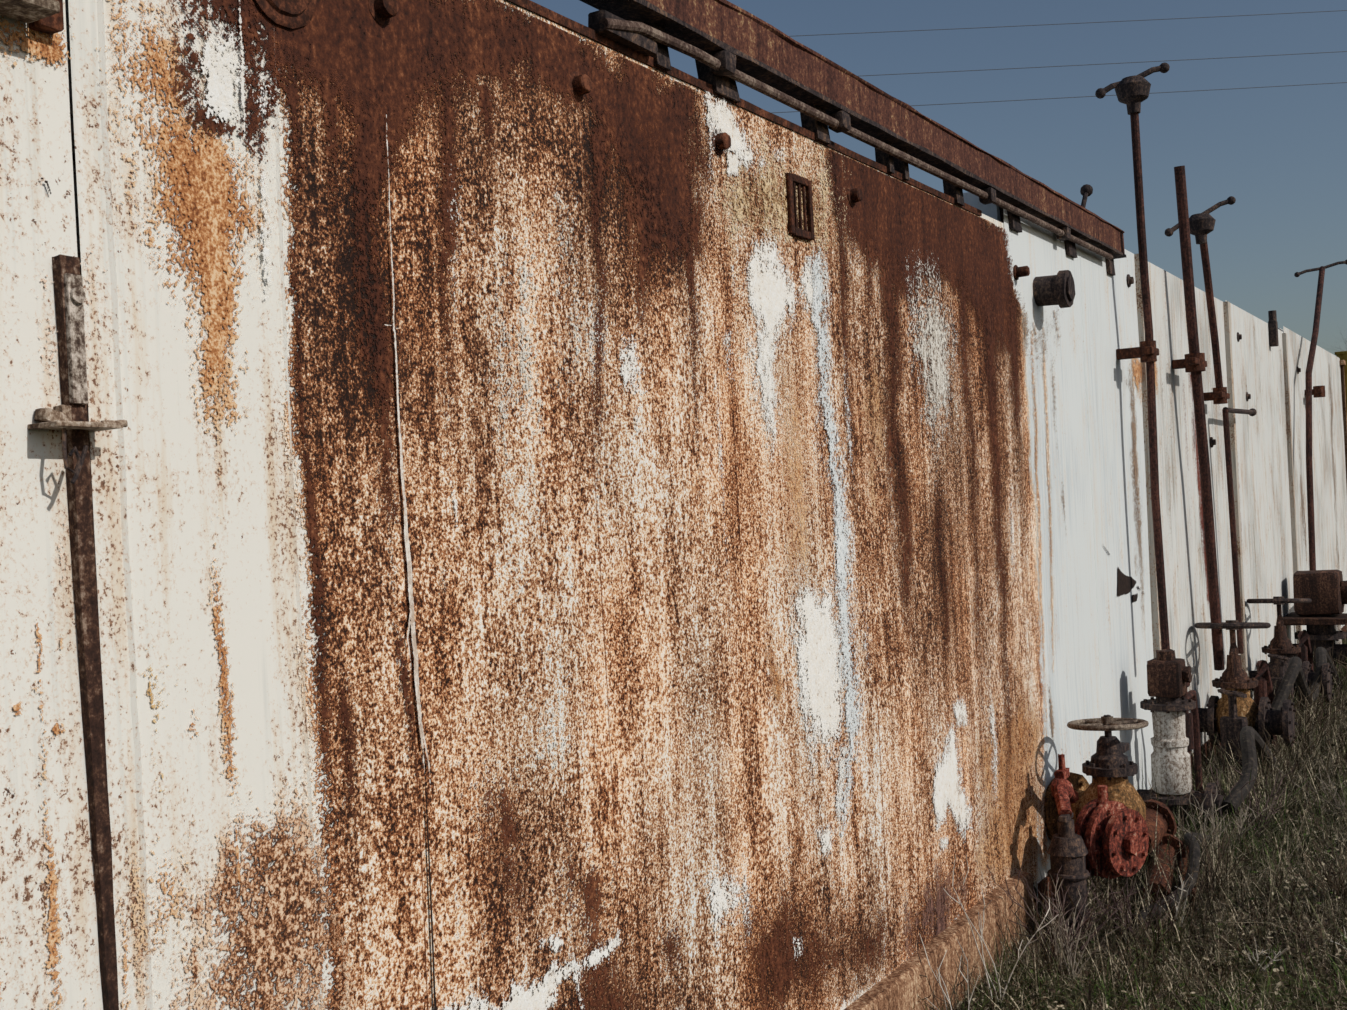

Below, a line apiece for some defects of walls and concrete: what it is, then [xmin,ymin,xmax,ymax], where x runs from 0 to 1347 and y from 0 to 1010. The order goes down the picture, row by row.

rust [96,0,1066,1010]
spalling [1104,546,1143,603]